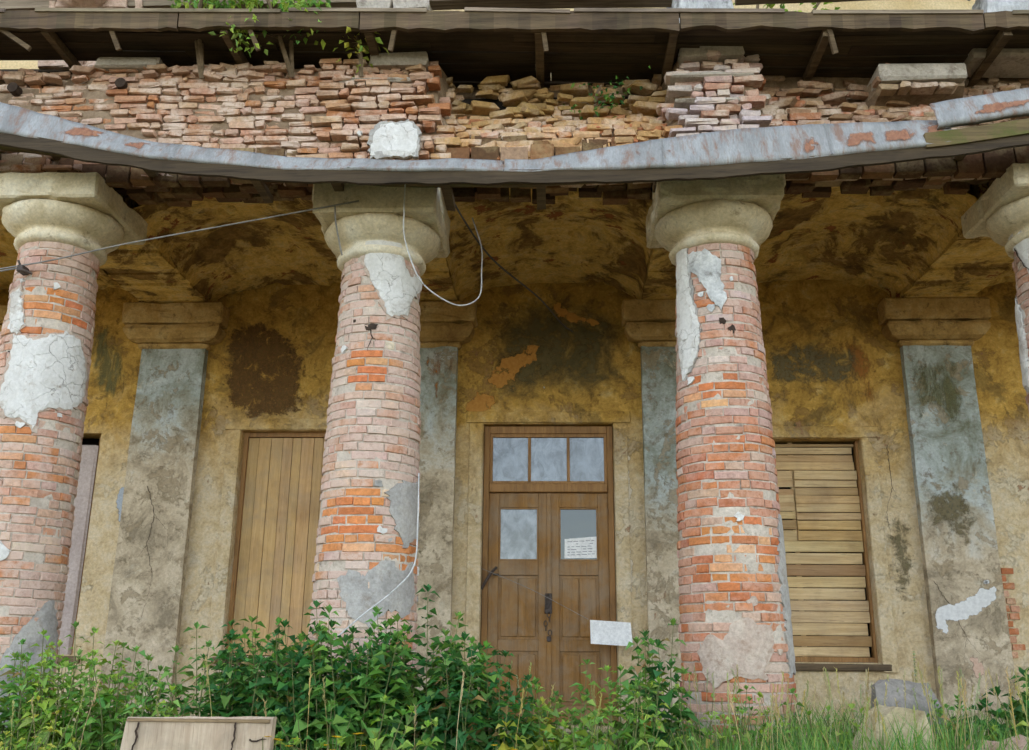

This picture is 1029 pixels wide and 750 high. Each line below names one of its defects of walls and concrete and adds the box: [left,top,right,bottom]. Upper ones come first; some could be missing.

spalling [0,61,322,86]
flaking render [357,119,422,160]
spalling [446,75,668,160]
spalling [772,81,927,125]
flaking render [0,278,88,443]
leakage [223,322,305,418]
flaking render [353,240,422,330]
flaking render [676,248,746,408]
leakage [770,343,856,386]
flaking render [321,480,419,576]
flaking render [689,512,783,688]
spalling [935,568,1026,658]